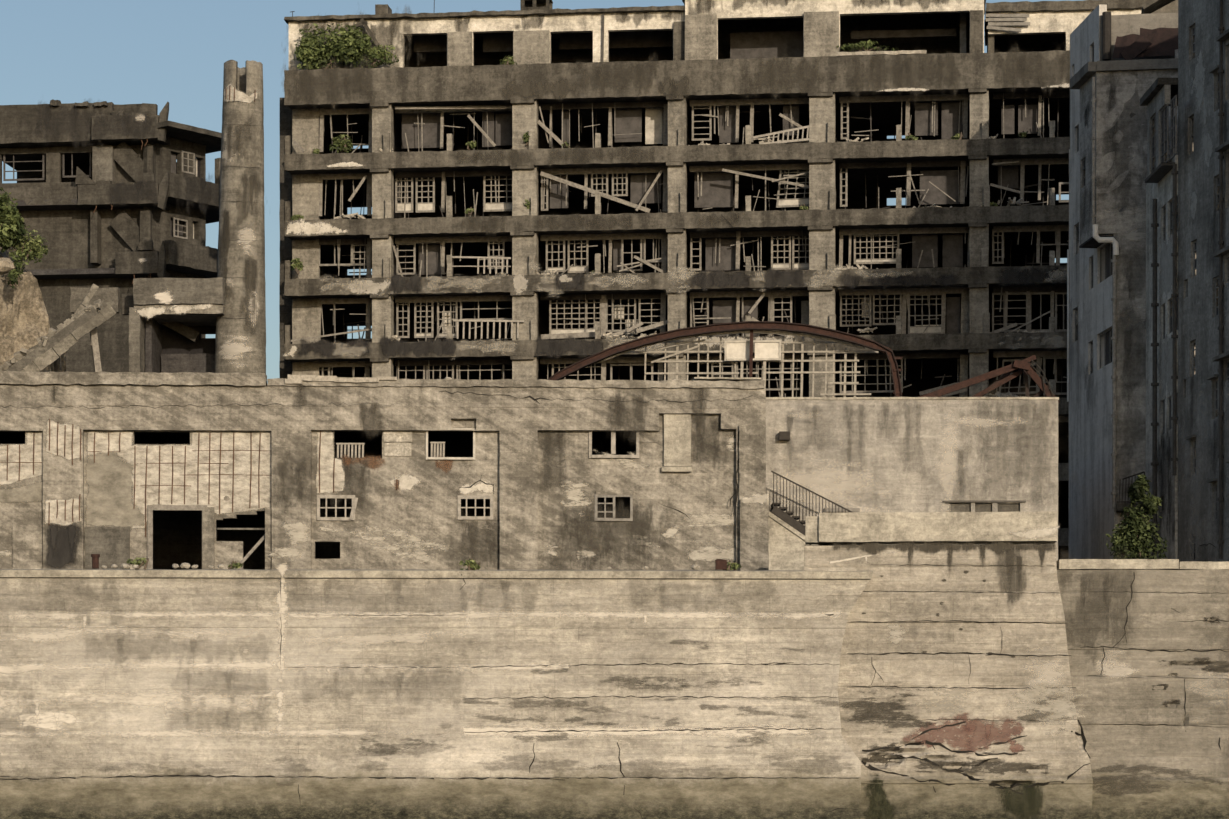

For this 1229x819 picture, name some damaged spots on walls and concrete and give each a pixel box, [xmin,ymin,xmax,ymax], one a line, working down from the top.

spalling [0,419,272,537]
peeling [460,480,495,494]
crack [0,564,1229,817]
spalling [843,688,933,769]
spalling [916,750,1048,775]